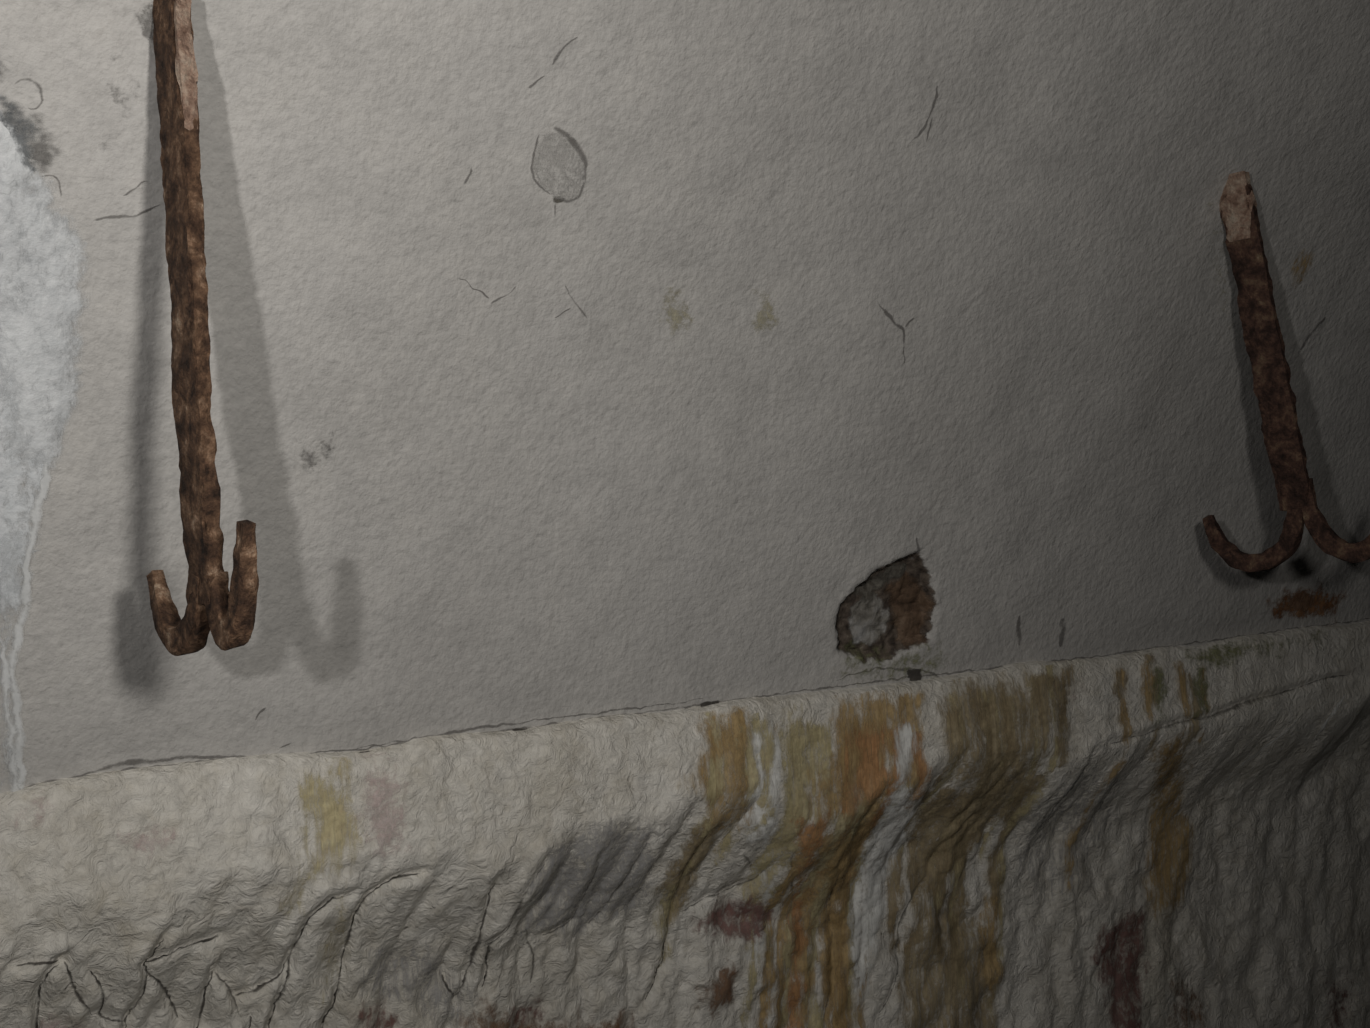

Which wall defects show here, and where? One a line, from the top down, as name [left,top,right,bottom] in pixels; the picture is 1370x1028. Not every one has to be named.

damp [0,96,35,167]
damp [31,135,54,169]
flaking render [835,538,939,681]
corrosion [1113,669,1132,745]
corrosion [655,665,1073,1028]
corrosion [1142,654,1209,915]
crack [17,873,416,1028]
crack [442,857,638,997]
crack [645,857,793,999]